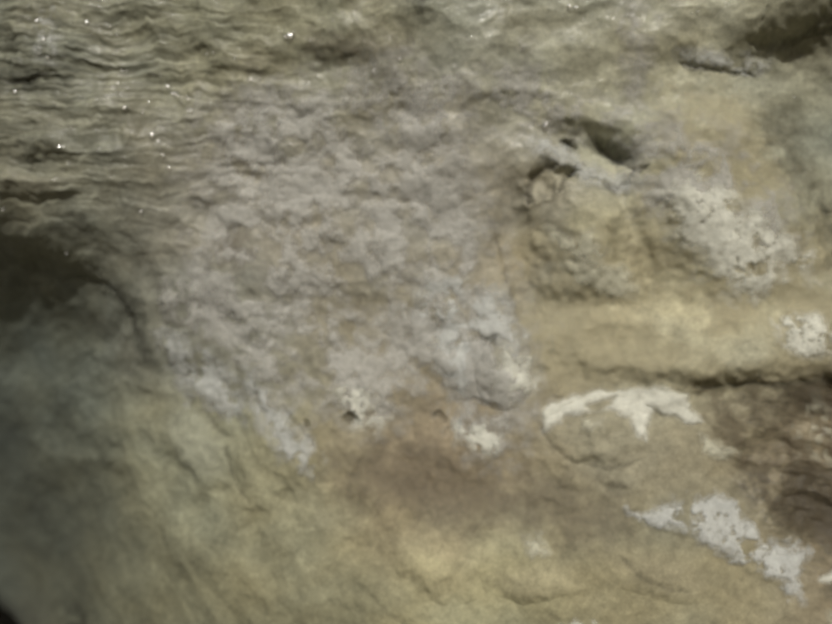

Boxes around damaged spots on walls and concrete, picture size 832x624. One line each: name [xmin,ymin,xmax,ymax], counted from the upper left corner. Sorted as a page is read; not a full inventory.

leakage [645,128,810,293]
leakage [784,314,826,357]
leakage [543,388,700,439]
leakage [635,507,683,528]
leakage [692,497,805,593]